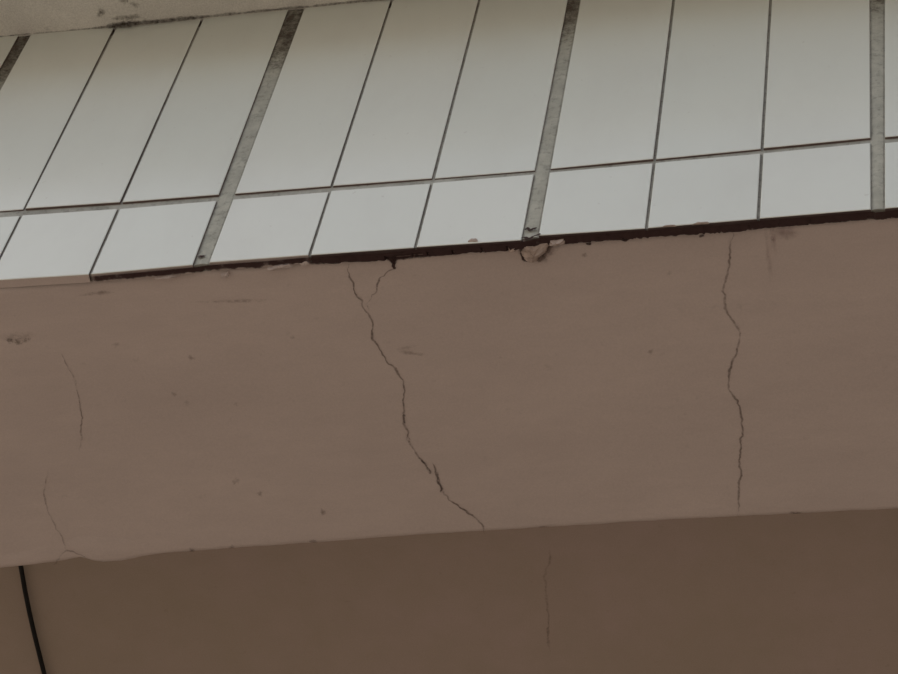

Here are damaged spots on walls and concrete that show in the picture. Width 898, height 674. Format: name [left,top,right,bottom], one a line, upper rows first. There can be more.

spalling [508,227,565,263]